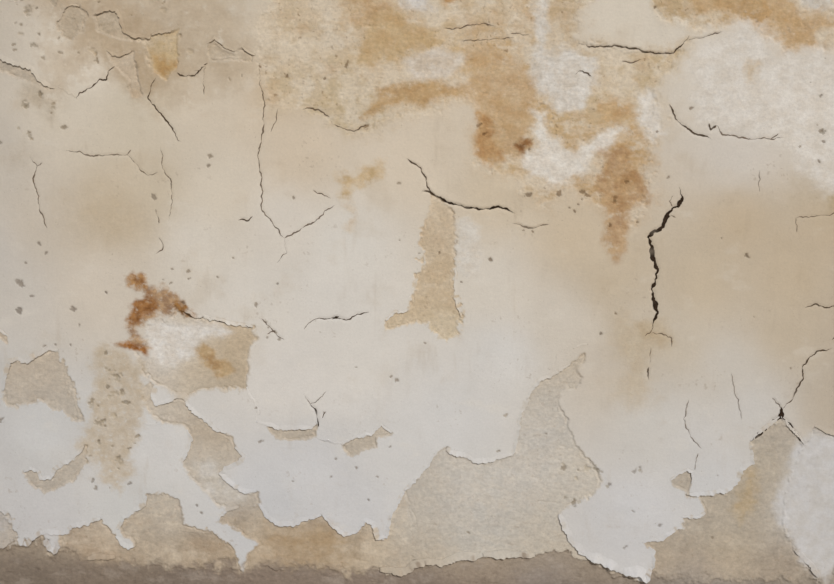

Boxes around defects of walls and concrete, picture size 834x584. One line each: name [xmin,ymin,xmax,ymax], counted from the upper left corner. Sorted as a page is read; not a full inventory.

crack [240,82,332,263]
peeling [255,0,466,140]
water stain [400,40,466,82]
peeling [417,0,534,59]
crack [408,159,547,229]
water stain [517,0,622,194]
peeling [541,0,681,147]
water stain [677,16,834,233]
corrosion [122,269,199,358]
crack [645,190,684,378]
peeling [0,300,822,584]
crack [753,338,834,445]